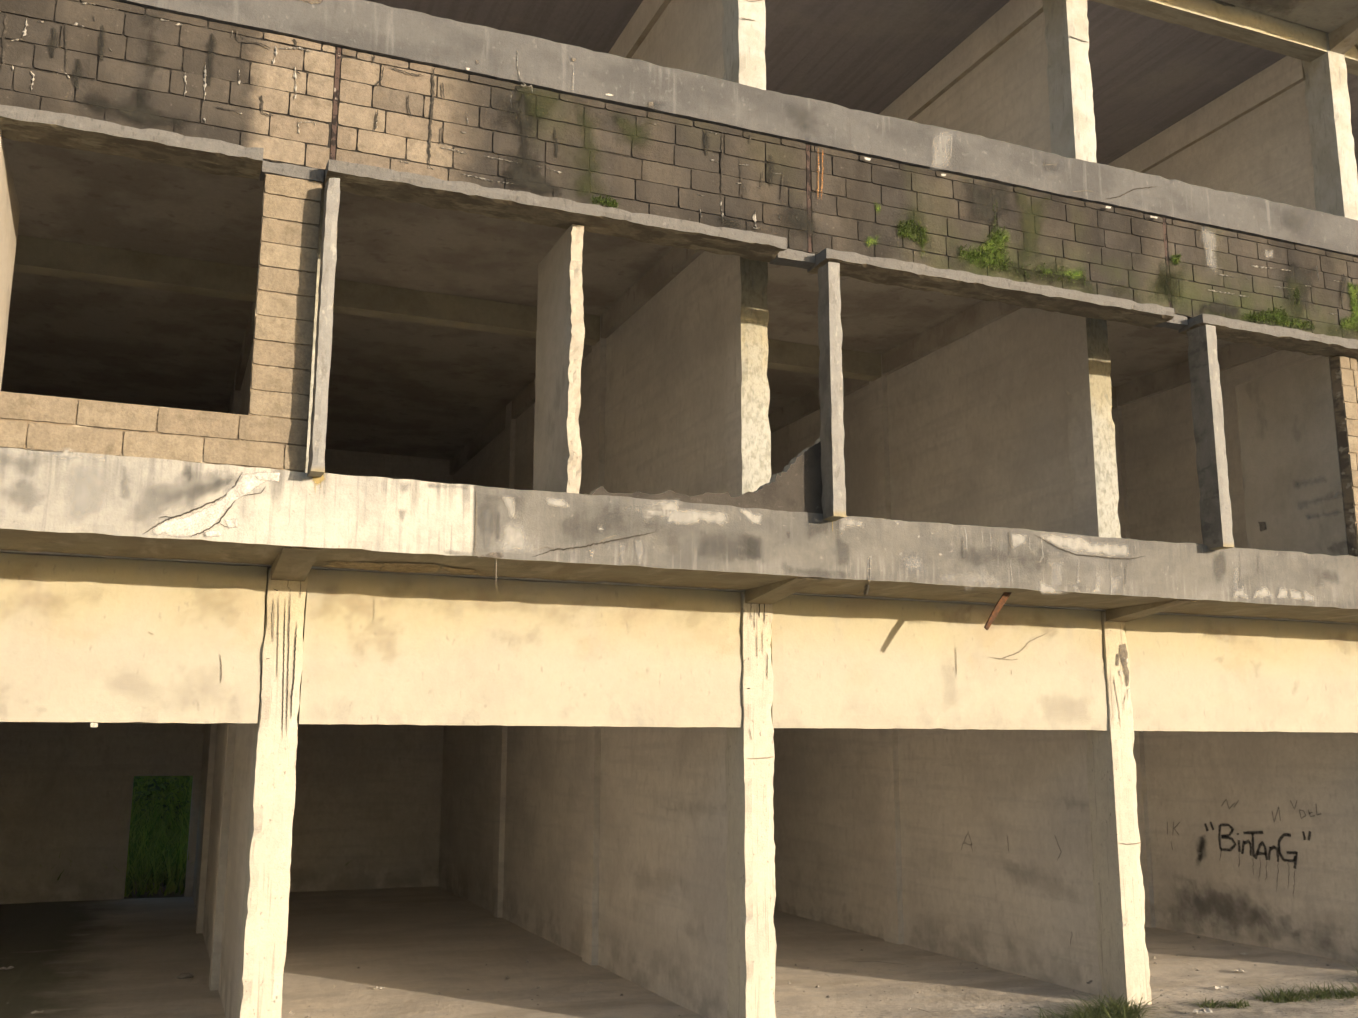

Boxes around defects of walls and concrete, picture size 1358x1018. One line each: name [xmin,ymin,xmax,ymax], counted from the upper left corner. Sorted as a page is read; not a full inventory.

water stain [11,18,57,58]
water stain [59,59,183,126]
water stain [203,33,216,101]
spalling [153,472,280,537]
crack [474,488,497,582]
crack [533,531,656,557]
spalling [1116,644,1130,700]